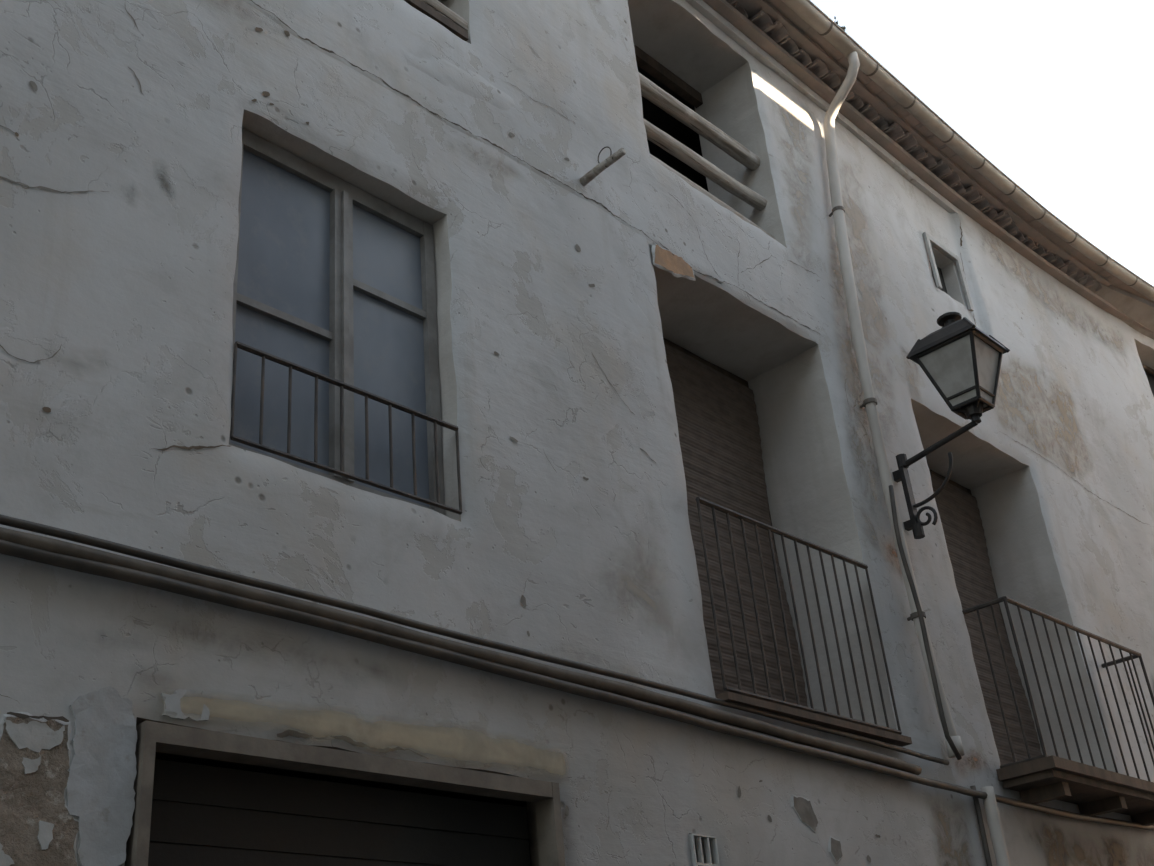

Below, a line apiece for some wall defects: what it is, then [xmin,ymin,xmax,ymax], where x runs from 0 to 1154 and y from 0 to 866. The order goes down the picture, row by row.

crack [242,0,844,335]
flaking render [651,244,696,281]
crack [0,344,62,363]
flaking render [0,712,79,866]
flaking render [791,794,843,864]